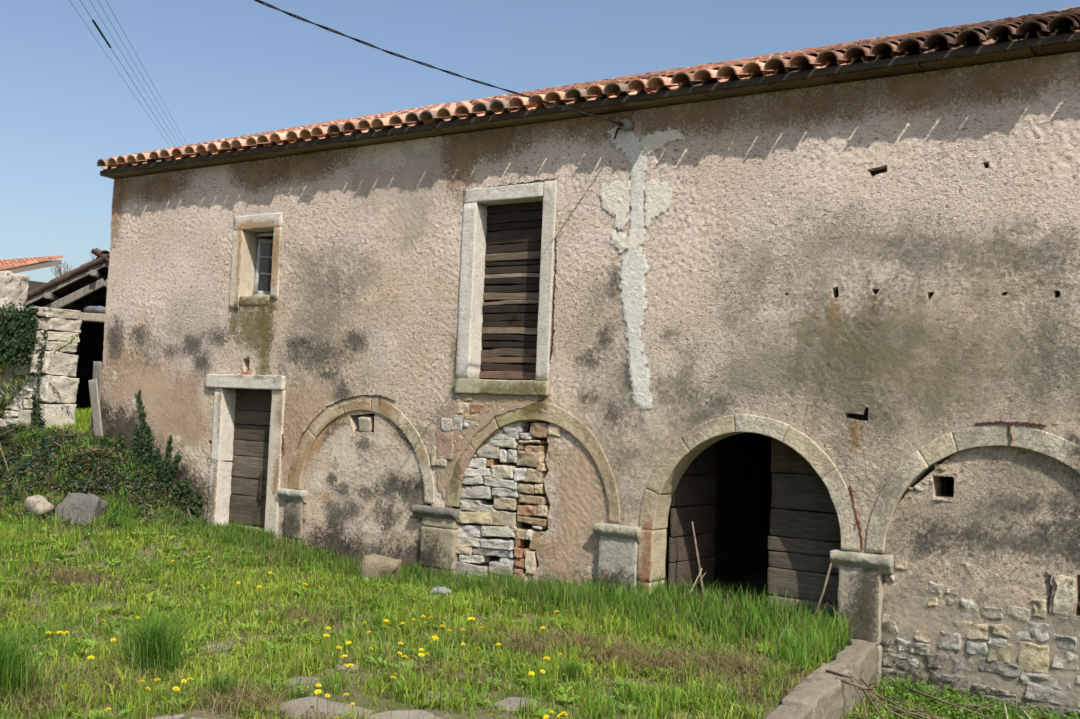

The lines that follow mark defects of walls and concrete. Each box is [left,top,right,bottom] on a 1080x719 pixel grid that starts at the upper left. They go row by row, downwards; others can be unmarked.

peeling [600,121,687,253]
water stain [107,317,151,360]
water stain [163,305,366,400]
water stain [354,435,370,467]
water stain [279,456,457,576]
spalling [308,392,606,586]
spalling [904,463,958,503]
peeling [944,556,985,571]
spalling [882,575,1080,719]